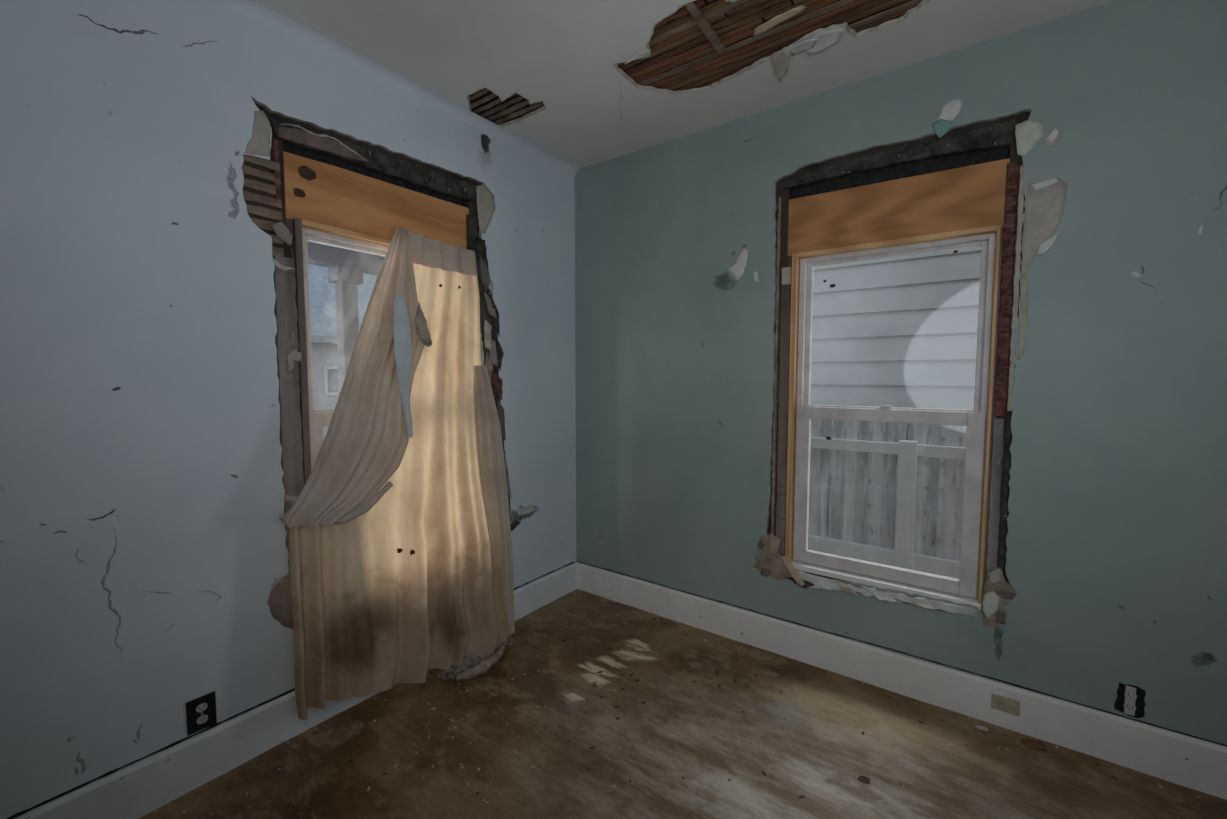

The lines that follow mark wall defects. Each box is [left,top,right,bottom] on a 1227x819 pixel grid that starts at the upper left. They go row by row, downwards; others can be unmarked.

crack [77,14,214,47]
flaking render [613,0,930,95]
flaking render [467,87,546,128]
peeling [932,99,963,138]
peeling [1015,121,1061,157]
flaking render [227,111,294,271]
peeling [717,244,759,288]
flaking render [753,533,791,580]
crack [40,508,122,654]
flaking render [981,567,1017,628]